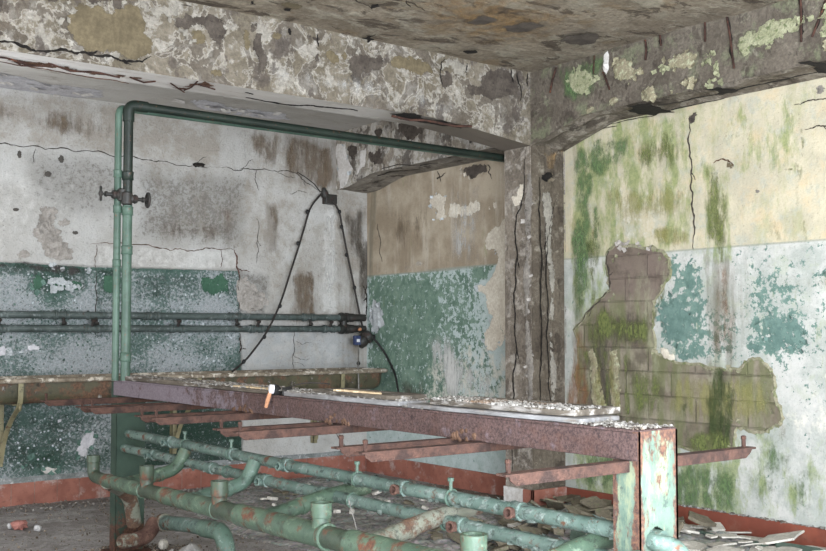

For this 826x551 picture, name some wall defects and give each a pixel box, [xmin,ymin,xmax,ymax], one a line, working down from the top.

crack [0,40,151,84]
crack [0,142,316,194]
crack [602,72,818,247]
peeling [0,262,121,475]
crack [92,219,261,312]
peeling [131,274,238,373]
peeling [368,299,385,334]
peeling [474,219,505,351]
crack [512,159,555,401]
damp [572,219,593,303]
peeling [652,284,695,360]